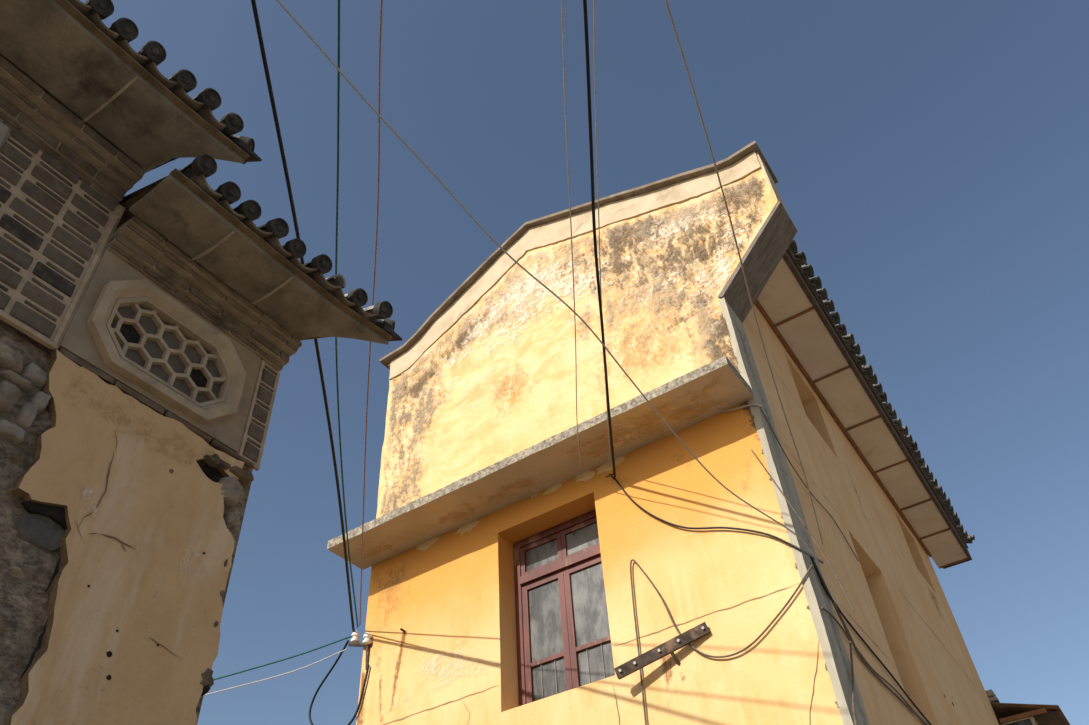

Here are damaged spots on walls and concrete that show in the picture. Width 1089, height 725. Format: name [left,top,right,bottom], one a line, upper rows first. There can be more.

damp [381,176,763,515]
flaking render [0,342,52,468]
flaking render [0,485,68,586]
crack [44,557,61,593]
crack [75,432,135,551]
spalling [197,453,254,531]
crack [20,621,47,679]
spalling [200,668,214,696]